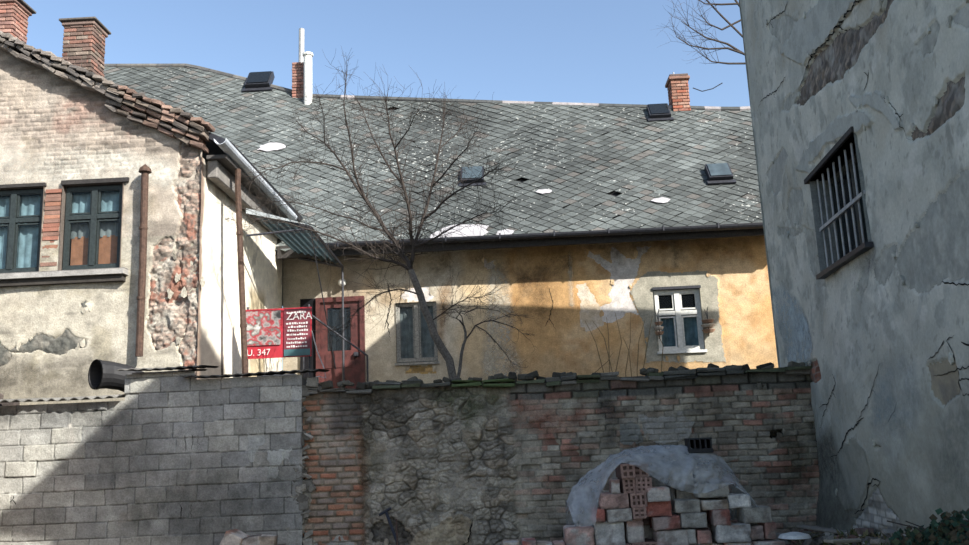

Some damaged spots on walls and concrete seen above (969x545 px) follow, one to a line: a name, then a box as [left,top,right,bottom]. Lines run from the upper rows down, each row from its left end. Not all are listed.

flaking render [783,0,894,111]
flaking render [911,77,965,142]
flaking render [147,138,205,379]
flaking render [576,246,651,332]
flaking render [0,330,87,366]
crack [929,335,969,396]
crack [831,366,879,460]
crack [854,478,880,514]
spalling [369,516,412,545]